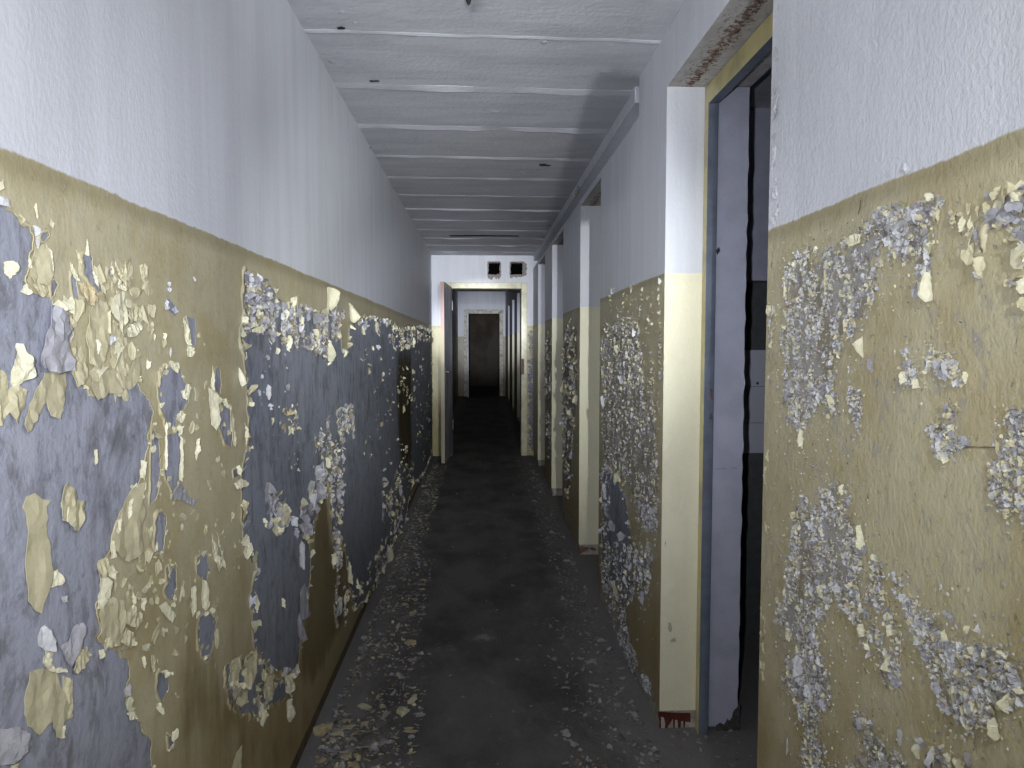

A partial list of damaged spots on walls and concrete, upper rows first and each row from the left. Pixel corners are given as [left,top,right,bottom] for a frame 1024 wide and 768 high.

peeling [947,180,1024,311]
peeling [0,181,201,768]
peeling [191,534,227,664]
peeling [209,265,434,727]
peeling [598,465,636,609]
peeling [232,745,243,768]